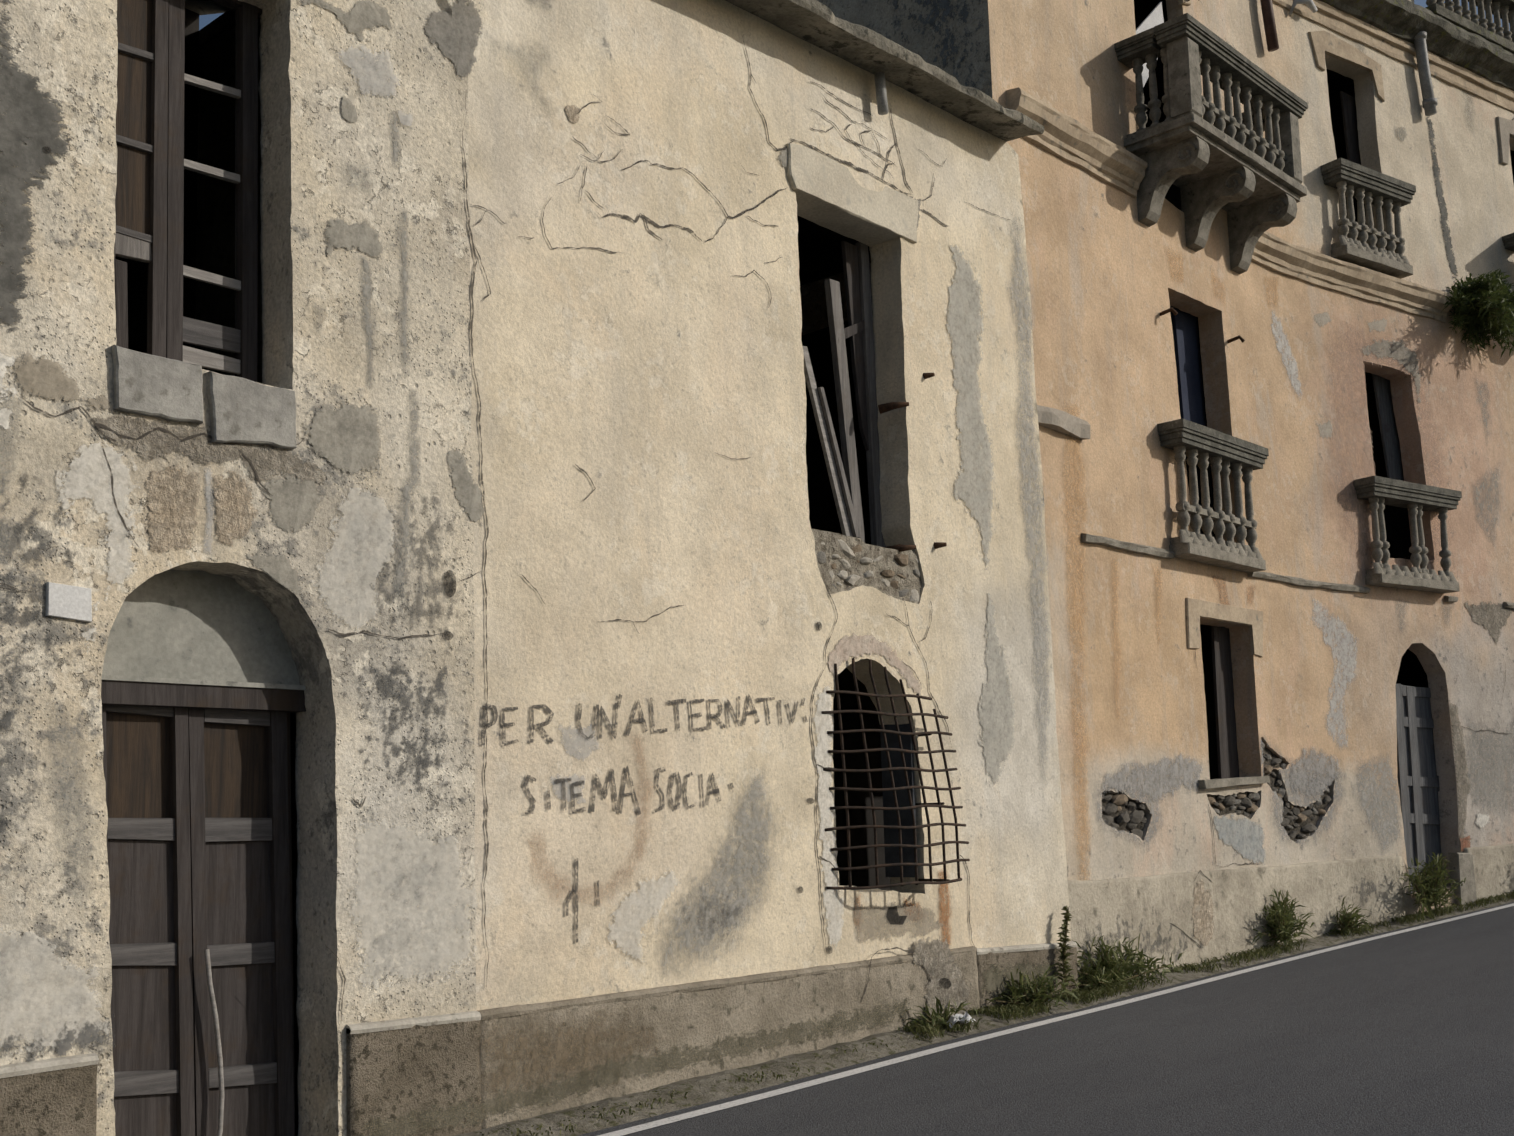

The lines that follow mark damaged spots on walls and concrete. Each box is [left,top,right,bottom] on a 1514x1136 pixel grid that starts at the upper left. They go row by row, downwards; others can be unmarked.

damp [0,0,72,332]
damp [1426,117,1458,283]
damp [0,401,63,731]
crack [16,394,273,547]
crack [459,41,1010,987]
spalling [811,529,922,604]
damp [608,777,772,966]
peeling [1214,814,1266,865]